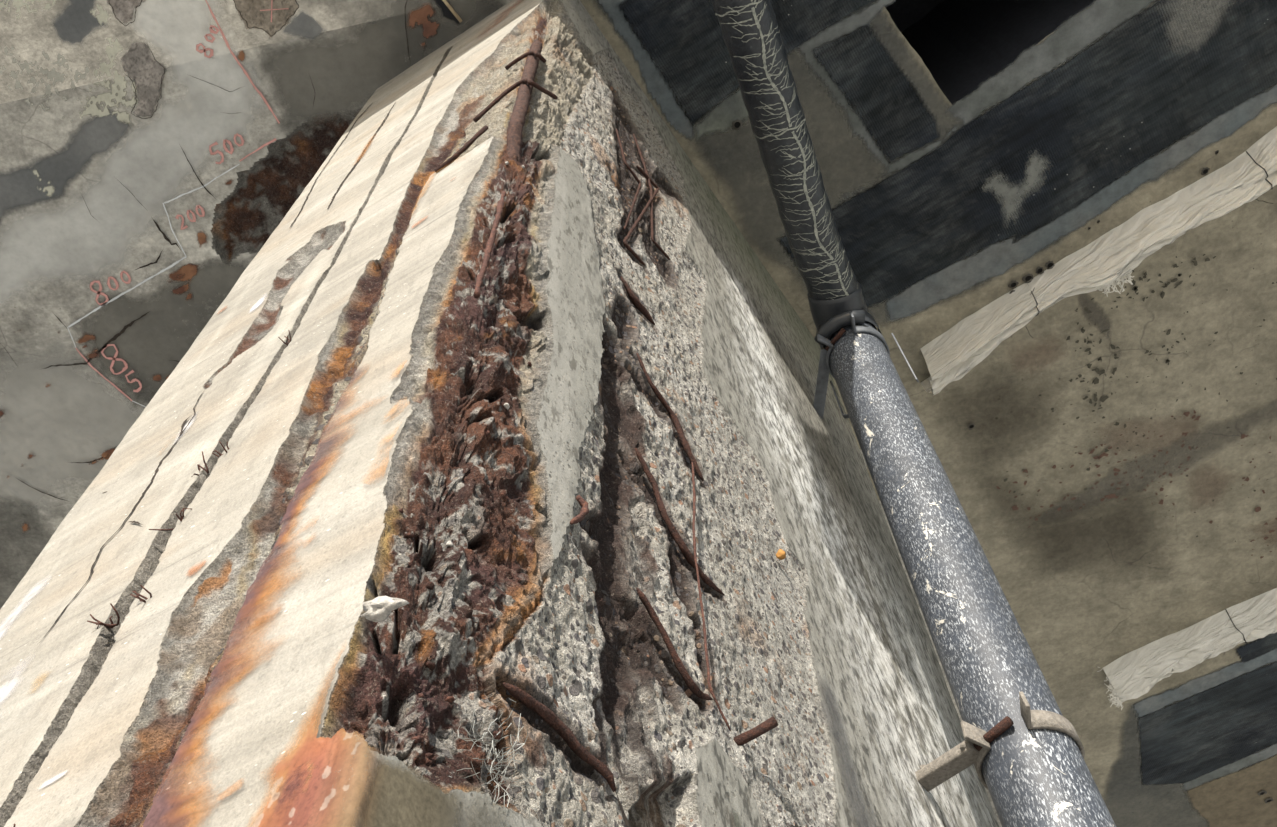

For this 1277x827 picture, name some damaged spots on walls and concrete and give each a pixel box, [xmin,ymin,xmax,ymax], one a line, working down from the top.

crack [0,0,453,827]
corrosion [143,375,375,827]
spalling [74,0,838,827]
corrosion [474,190,506,299]